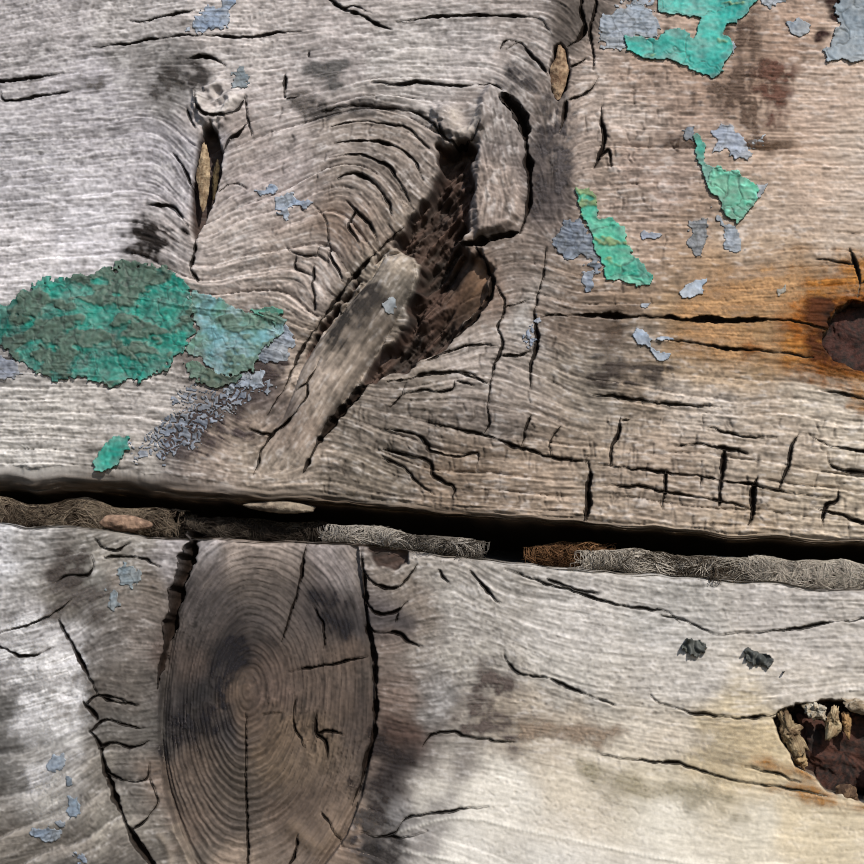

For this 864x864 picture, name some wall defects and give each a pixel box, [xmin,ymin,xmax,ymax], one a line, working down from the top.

peeling [598,0,786,79]
peeling [822,0,864,63]
peeling [0,259,296,472]
crack [250,104,479,475]
crack [303,79,864,526]
peeling [552,187,653,293]
peeling [682,123,768,257]
corrosion [673,258,864,382]
crack [0,598,158,864]
crack [56,530,207,689]
crack [281,545,420,806]
crack [509,570,864,635]